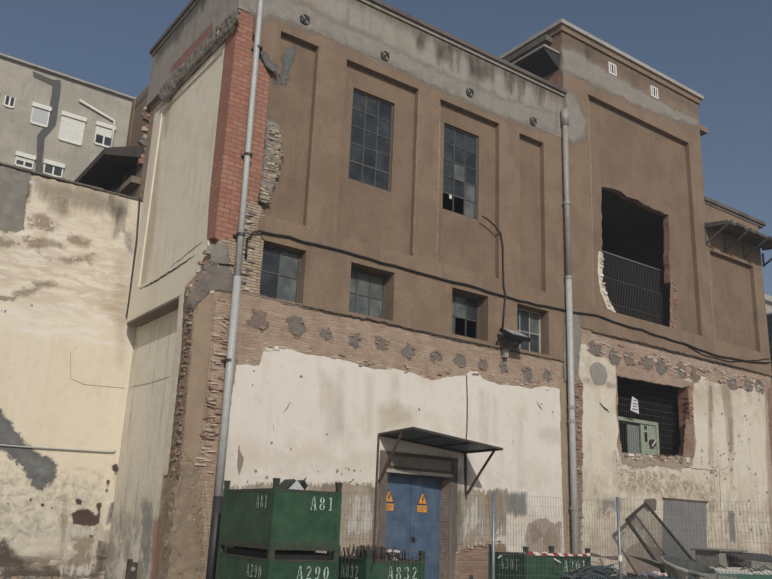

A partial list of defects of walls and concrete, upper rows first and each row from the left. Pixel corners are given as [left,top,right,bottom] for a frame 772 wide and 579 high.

peeling [170,23,212,73]
spalling [169,120,562,539]
spalling [592,248,616,312]
spalling [668,278,678,329]
spalling [580,332,772,482]
damp [0,541,99,579]
peeling [60,499,102,577]
flaking render [305,468,379,556]
flaking render [454,487,508,579]
flaking render [525,518,562,553]
spalling [631,489,662,513]